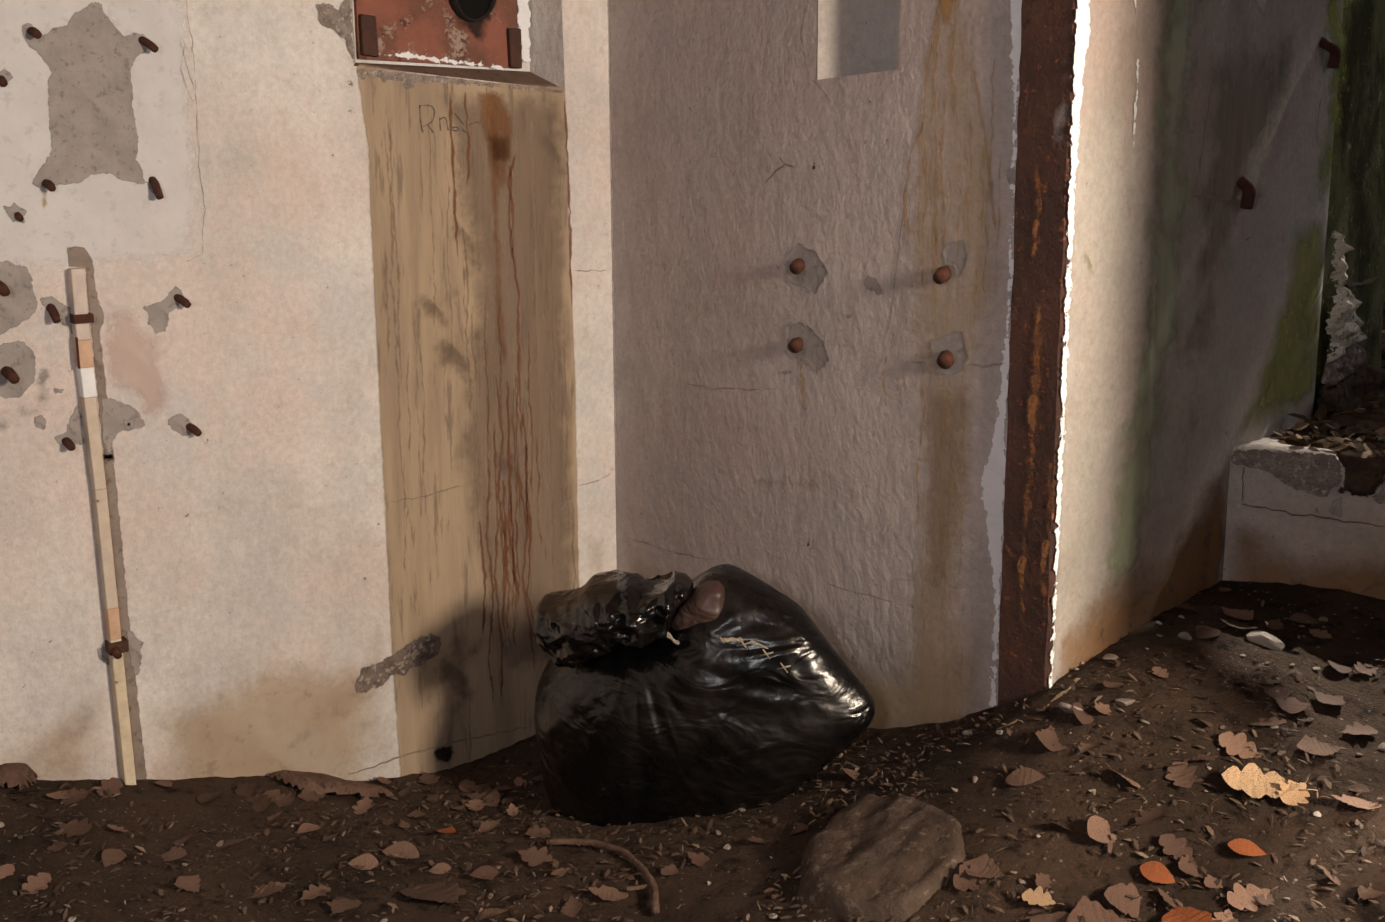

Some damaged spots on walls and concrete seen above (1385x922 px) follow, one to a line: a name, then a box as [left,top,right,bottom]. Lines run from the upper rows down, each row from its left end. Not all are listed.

spalling [22,2,154,193]
spalling [0,261,73,398]
spalling [34,406,84,445]
spalling [101,397,145,454]
spalling [1231,449,1342,497]
crack [1242,469,1383,527]
spalling [355,633,441,693]